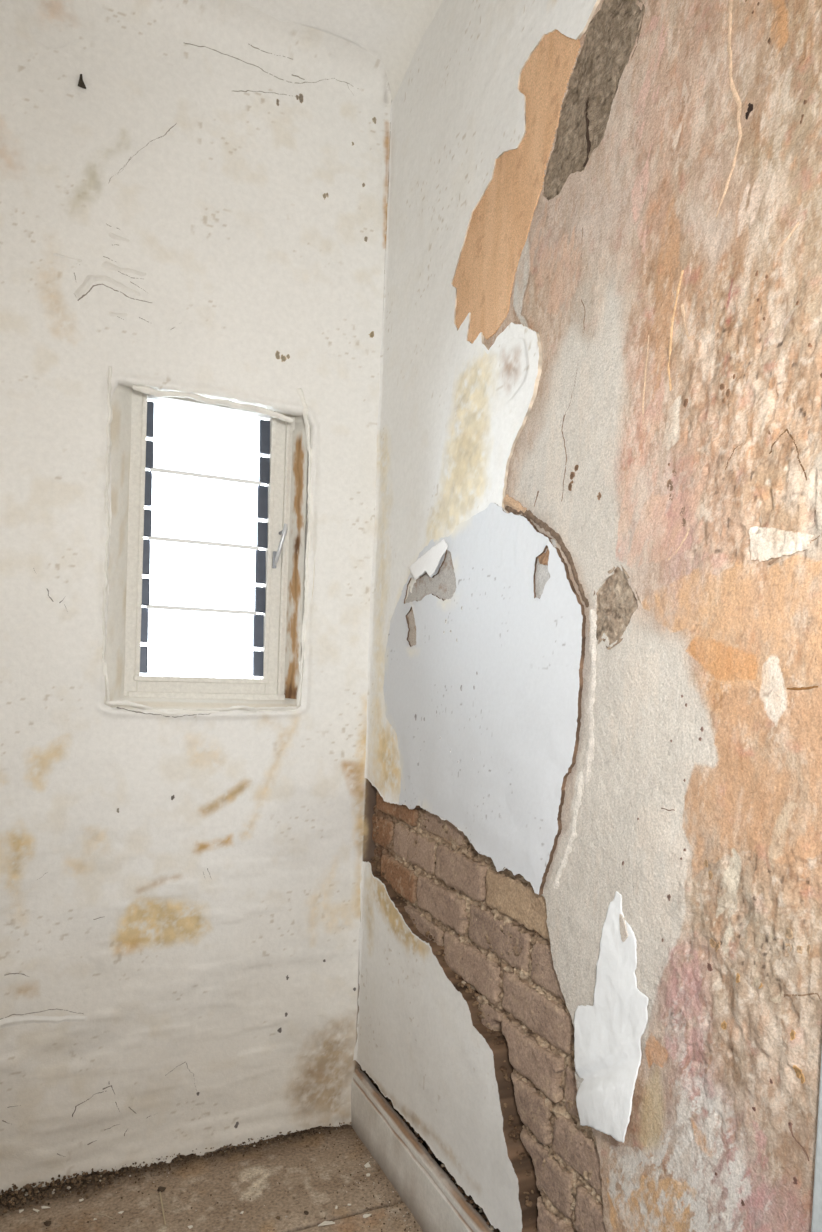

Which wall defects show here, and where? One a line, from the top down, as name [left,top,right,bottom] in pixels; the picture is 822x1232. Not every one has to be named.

crack [185,43,358,97]
corrosion [284,427,308,699]
peeling [371,0,822,1232]
damp [0,729,76,797]
damp [178,706,310,858]
damp [0,813,42,932]
damp [103,869,217,961]
crack [0,1009,88,1029]
damp [279,1001,484,1203]
damp [0,1199,170,1232]
damp [235,1163,270,1204]